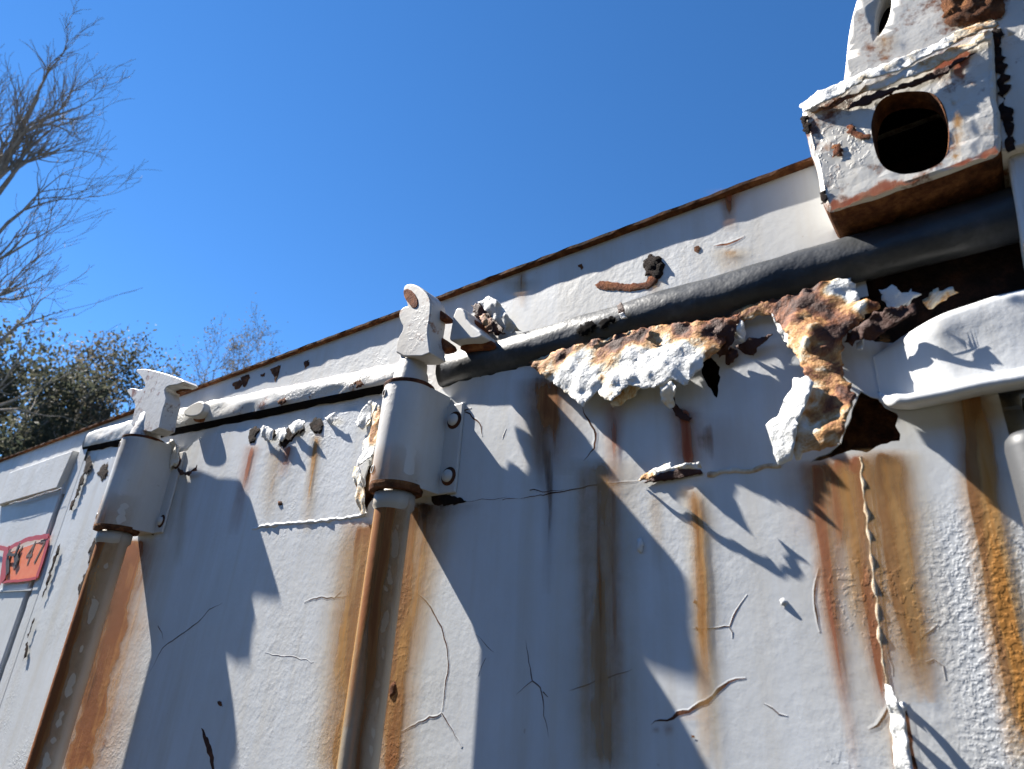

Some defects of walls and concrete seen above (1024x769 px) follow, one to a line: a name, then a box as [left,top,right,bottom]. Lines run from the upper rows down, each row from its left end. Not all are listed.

peeling [799,20,999,135]
corrosion [595,254,665,292]
peeling [529,278,959,465]
peeling [248,412,338,449]
crack [464,405,638,502]
peeling [638,462,703,483]
corrosion [811,453,925,696]
corrosion [961,396,1024,738]
corrosion [25,542,112,769]
crack [400,590,463,748]
crack [516,639,632,738]
crack [651,677,746,725]